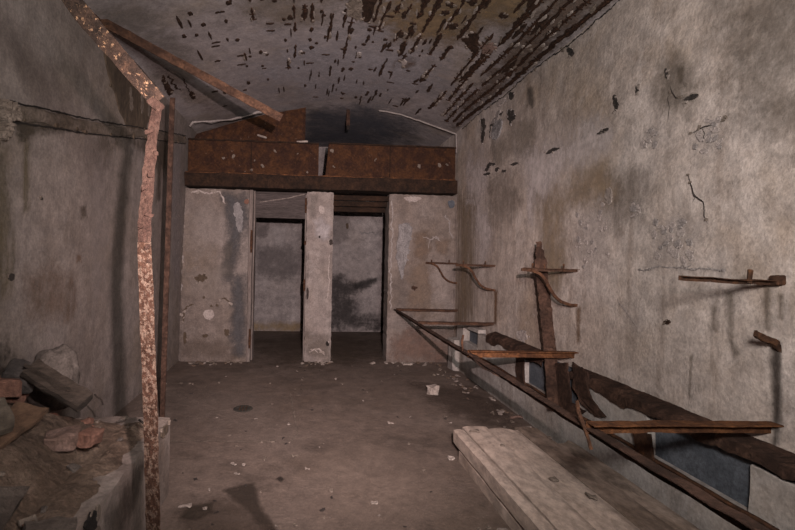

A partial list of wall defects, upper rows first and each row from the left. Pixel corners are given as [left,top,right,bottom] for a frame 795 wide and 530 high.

spalling [176,11,240,47]
flaking render [103,52,152,130]
spalling [129,55,174,96]
flaking render [237,48,269,81]
spalling [266,0,612,144]
crack [686,174,708,221]
leakage [194,193,248,356]
flaking render [203,296,233,320]